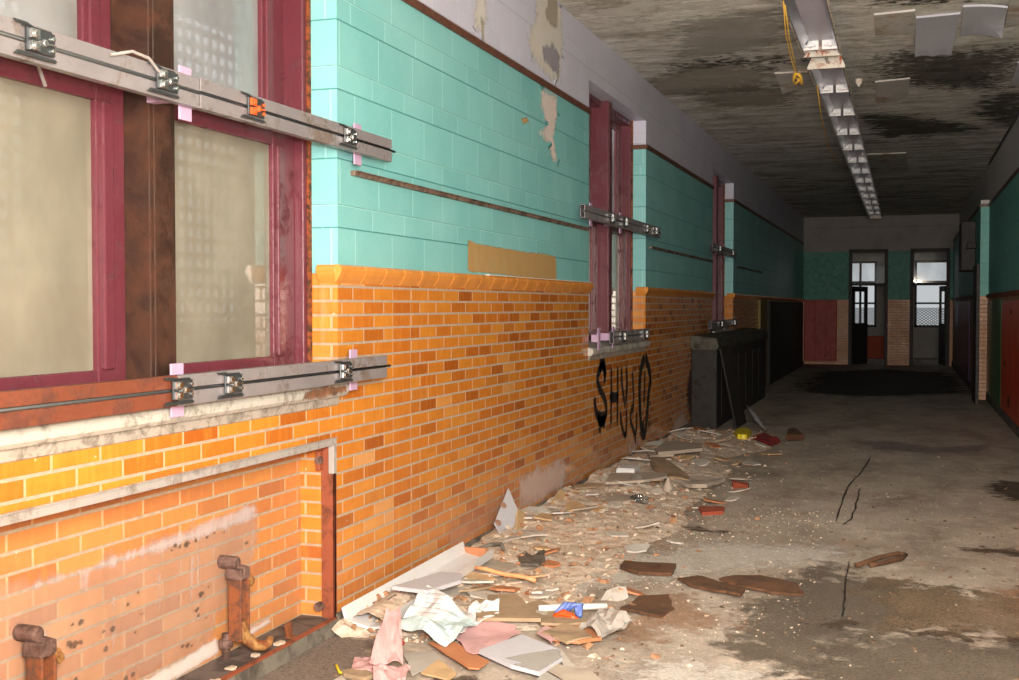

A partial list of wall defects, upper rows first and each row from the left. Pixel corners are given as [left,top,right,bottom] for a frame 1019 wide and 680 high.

peeling [527,0,564,166]
damp [648,54,810,107]
damp [851,38,1019,141]
crack [836,456,871,525]
damp [100,507,255,566]
crack [842,562,869,617]